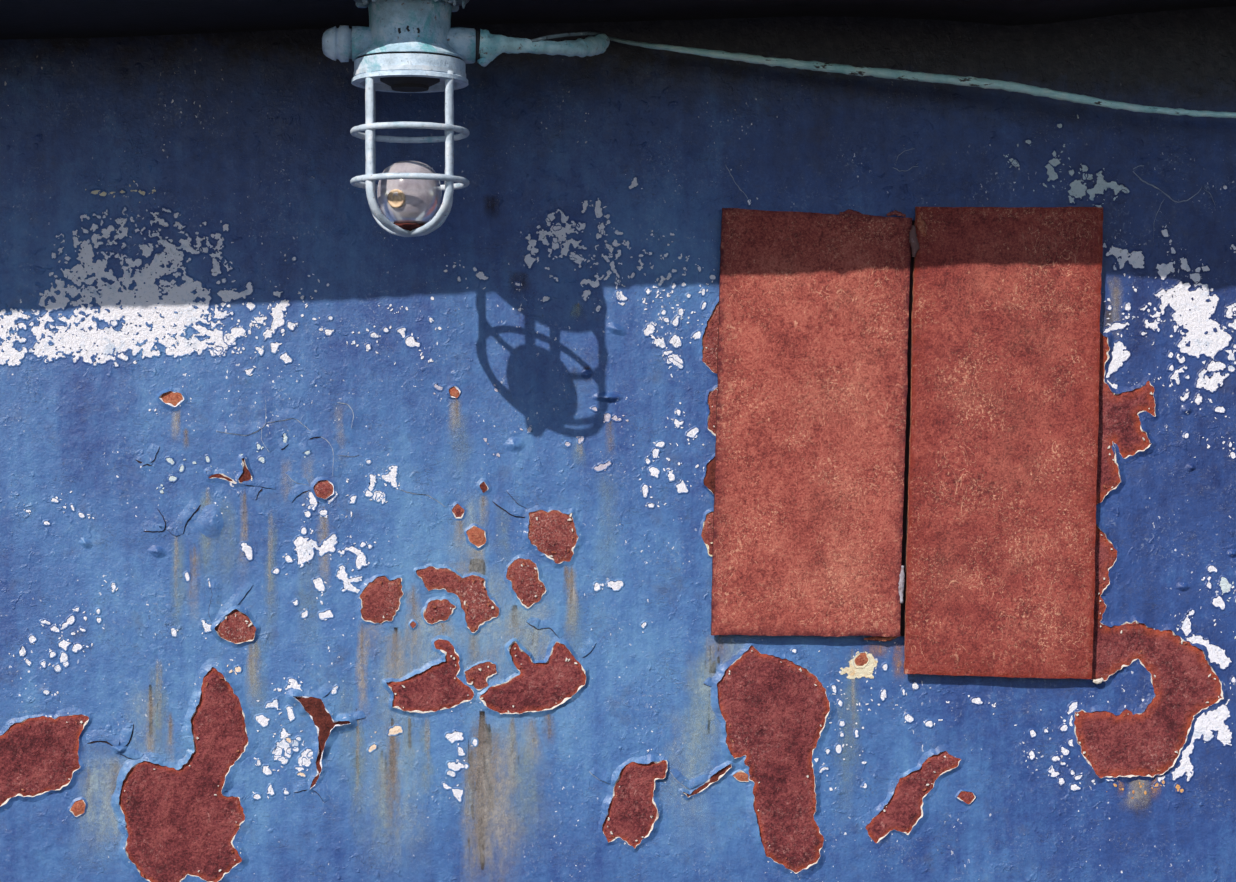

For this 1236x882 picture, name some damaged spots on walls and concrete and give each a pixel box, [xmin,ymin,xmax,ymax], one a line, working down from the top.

spalling [0,180,336,377]
spalling [508,196,719,559]
spalling [9,606,104,674]
peeling [200,604,261,648]
peeling [271,458,590,754]
peeling [1014,225,1236,799]
peeling [0,707,93,819]
peeling [109,658,359,882]
spalling [441,729,479,804]
peeling [598,749,670,853]
peeling [678,636,943,880]
peeling [859,744,966,849]